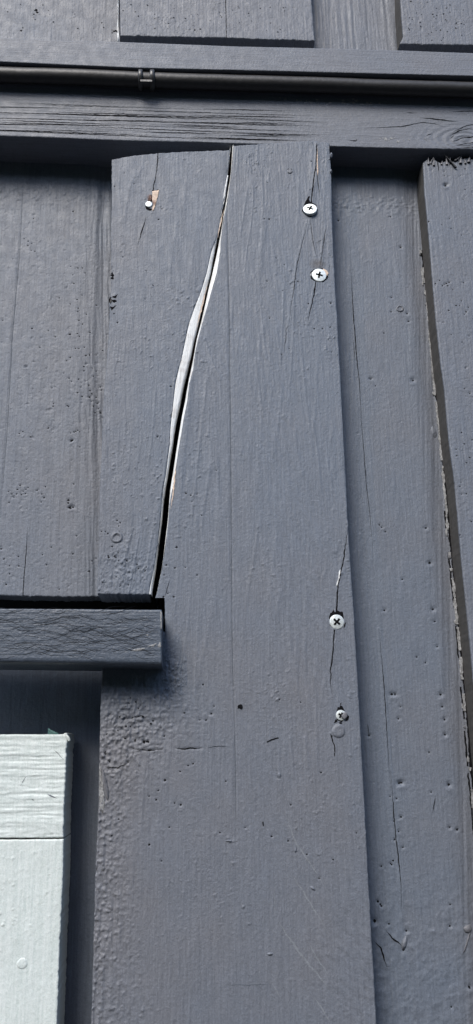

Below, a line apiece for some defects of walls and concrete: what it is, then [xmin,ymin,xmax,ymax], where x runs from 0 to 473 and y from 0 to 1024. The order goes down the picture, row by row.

peeling [145,190,162,220]
crack [0,102,326,661]
crack [330,267,372,685]